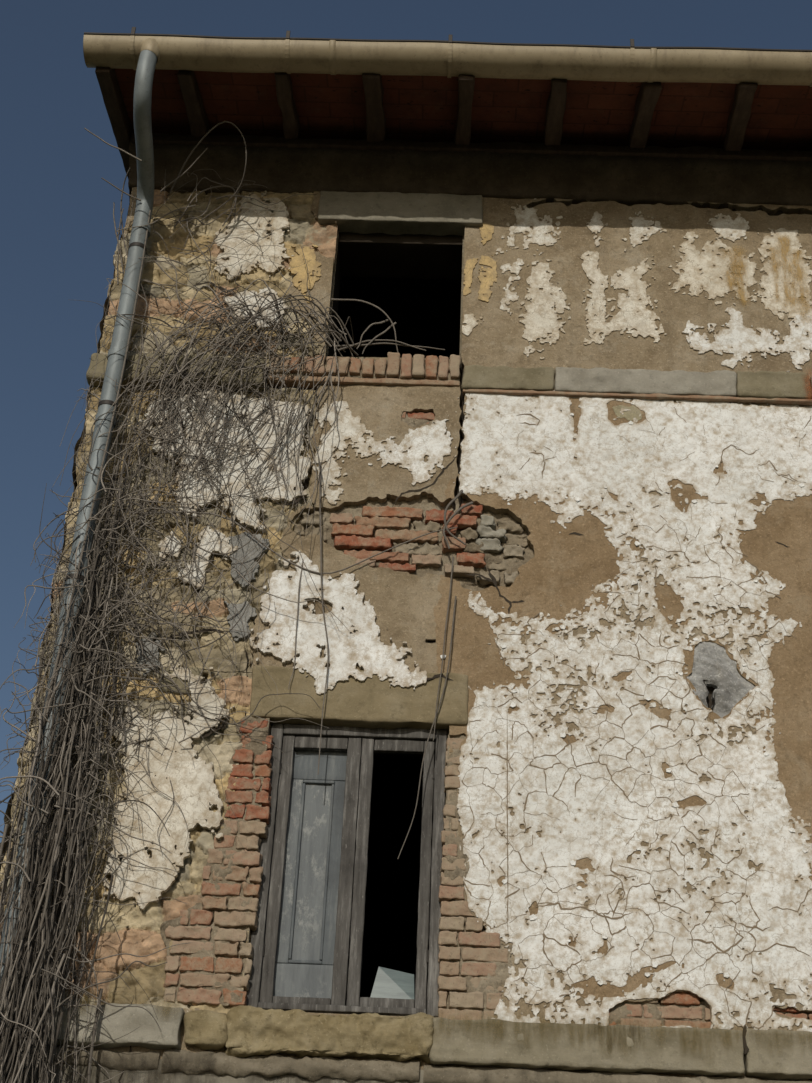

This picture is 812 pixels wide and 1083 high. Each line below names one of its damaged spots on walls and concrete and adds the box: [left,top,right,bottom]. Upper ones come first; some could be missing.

peeling [214,191,321,329]
peeling [462,198,667,360]
peeling [668,213,812,372]
peeling [667,479,708,513]
peeling [653,581,689,628]
flaking render [103,664,274,1007]
peeling [139,387,646,1020]
crack [461,407,812,1054]
peeling [672,795,707,810]
peeling [679,483,812,889]
flaking render [571,961,711,1028]
flaking render [772,1007,812,1019]